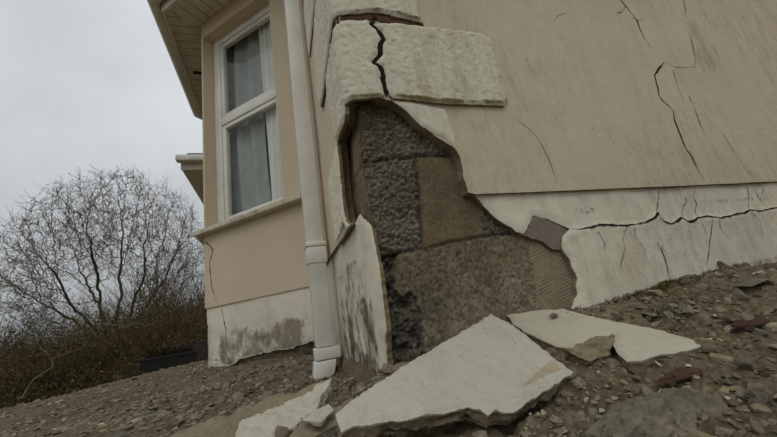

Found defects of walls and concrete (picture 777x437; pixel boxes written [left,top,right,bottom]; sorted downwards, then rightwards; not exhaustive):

crack [369,16,388,96]
crack [571,39,777,279]
spalling [347,101,573,365]
crack [205,242,227,344]
damp [215,334,242,364]
damp [243,319,302,356]
damp [341,298,377,372]